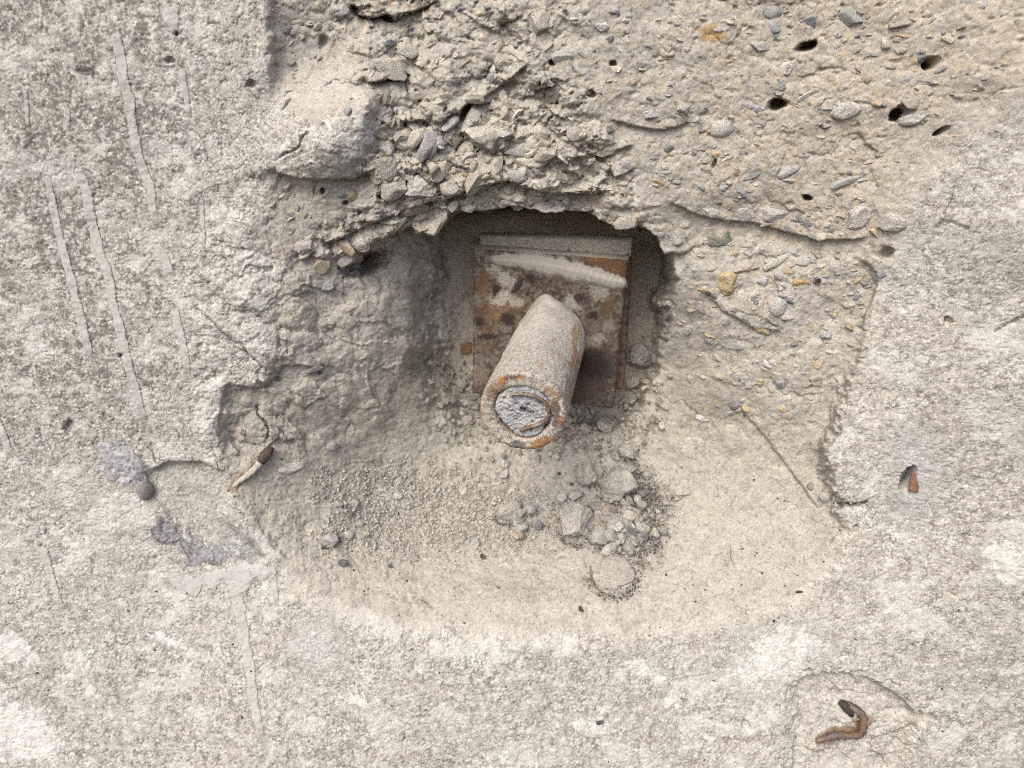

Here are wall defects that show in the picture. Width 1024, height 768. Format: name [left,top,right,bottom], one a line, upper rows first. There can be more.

spalling [254,0,1024,428]
rust [815,710,874,746]